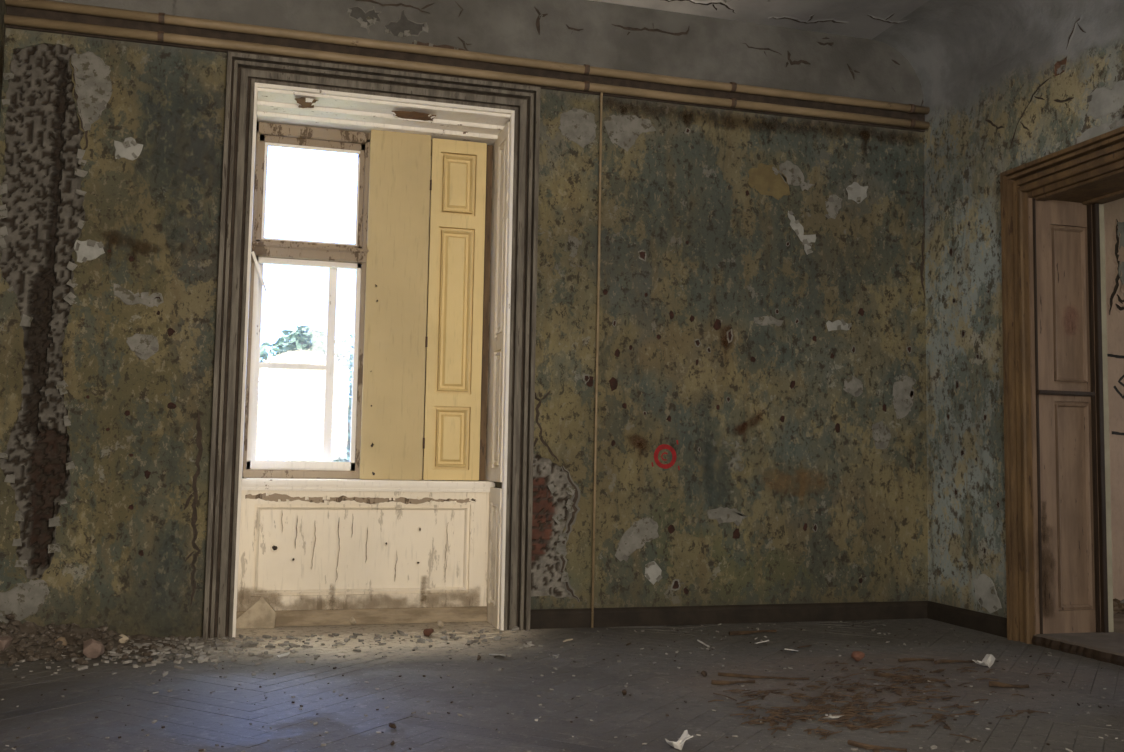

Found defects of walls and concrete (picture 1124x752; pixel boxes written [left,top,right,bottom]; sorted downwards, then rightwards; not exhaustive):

crack [352,0,472,51]
crack [532,7,584,35]
crack [611,0,736,38]
crack [742,13,910,80]
peeling [1075,80,1124,144]
peeling [788,210,816,255]
crack [1107,219,1124,315]
spalling [0,44,112,623]
peeling [615,517,675,562]
peeling [645,561,689,594]